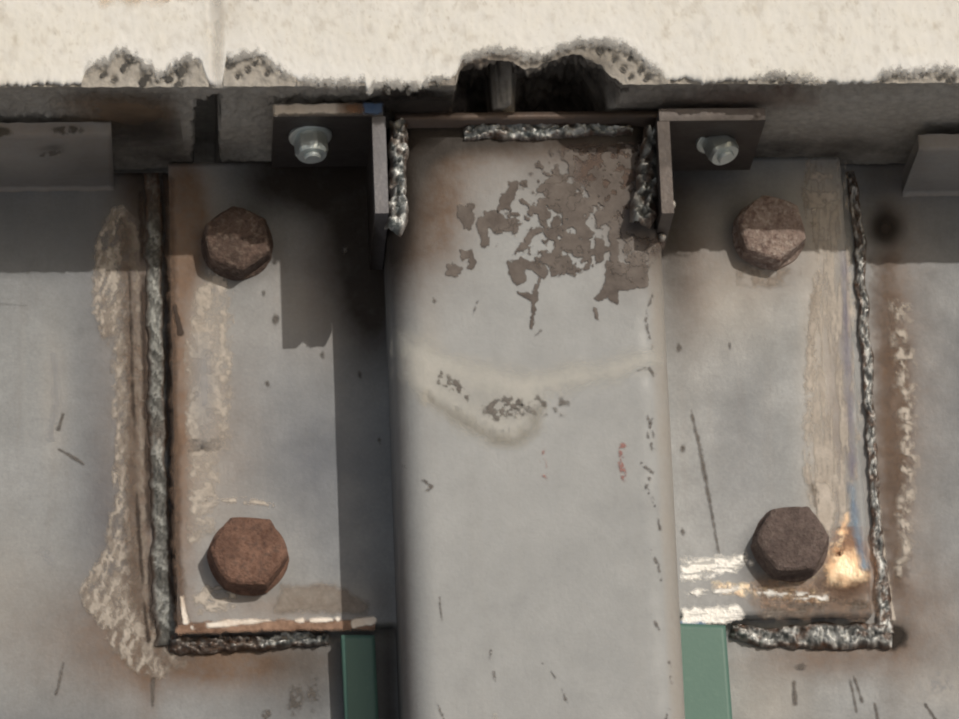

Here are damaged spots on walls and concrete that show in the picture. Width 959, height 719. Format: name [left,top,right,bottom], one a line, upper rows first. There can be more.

spalling [224,36,670,96]
peeling [445,142,662,329]